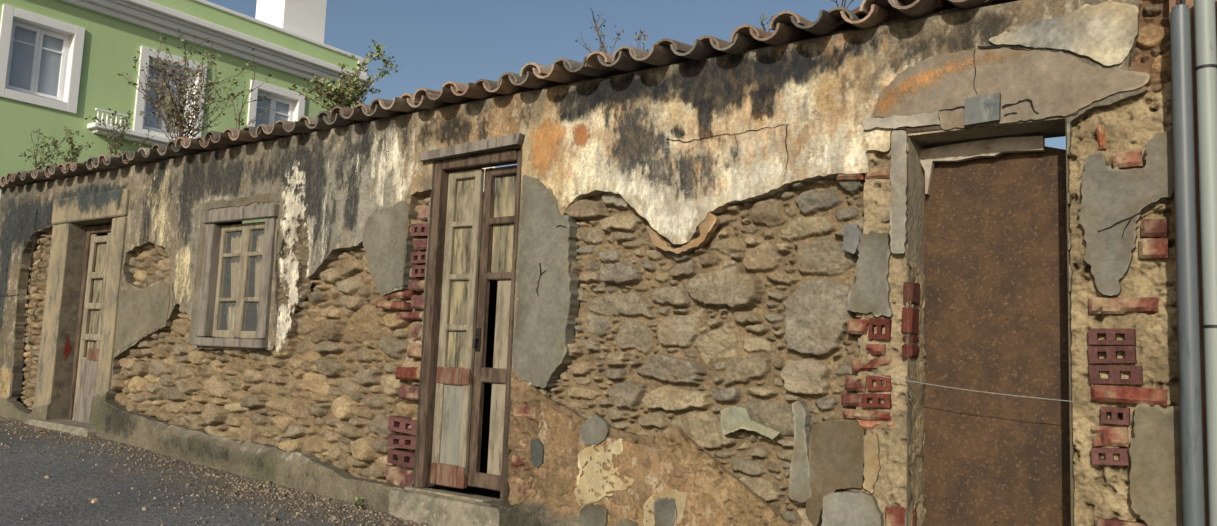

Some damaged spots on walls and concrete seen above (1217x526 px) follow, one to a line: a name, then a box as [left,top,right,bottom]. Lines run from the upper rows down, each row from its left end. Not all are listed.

flaking render [20,228,53,411]
leakage [0,116,418,351]
flaking render [111,194,431,487]
flaking render [508,150,926,526]
leakage [554,30,887,238]
crack [666,124,789,166]
crack [939,45,1060,116]
flaking render [989,0,1180,526]